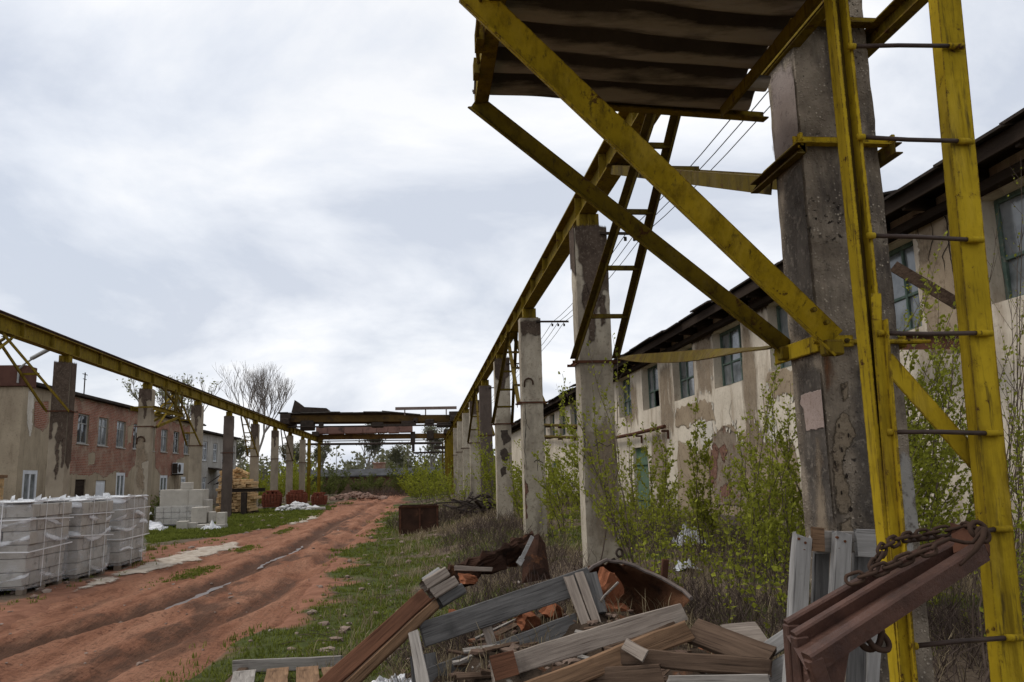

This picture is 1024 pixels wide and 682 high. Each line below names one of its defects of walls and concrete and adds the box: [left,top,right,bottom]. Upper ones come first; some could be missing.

damp [569,225,609,343]
damp [49,361,77,479]
damp [139,388,152,419]
peeling [674,338,803,524]